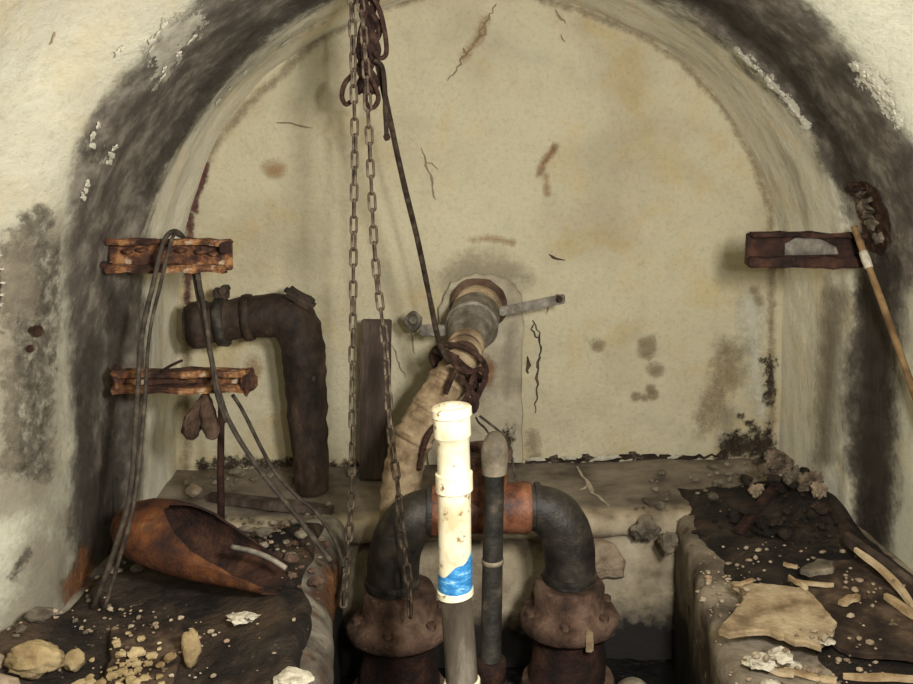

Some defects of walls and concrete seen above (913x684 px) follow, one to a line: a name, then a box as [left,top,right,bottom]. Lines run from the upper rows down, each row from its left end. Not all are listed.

crack [447,4,497,81]
spalling [845,181,892,256]
leakage [0,0,329,575]
leakage [653,0,913,550]
spalling [26,325,45,352]
crack [526,307,549,413]
crack [524,451,717,506]
leakage [10,548,32,580]